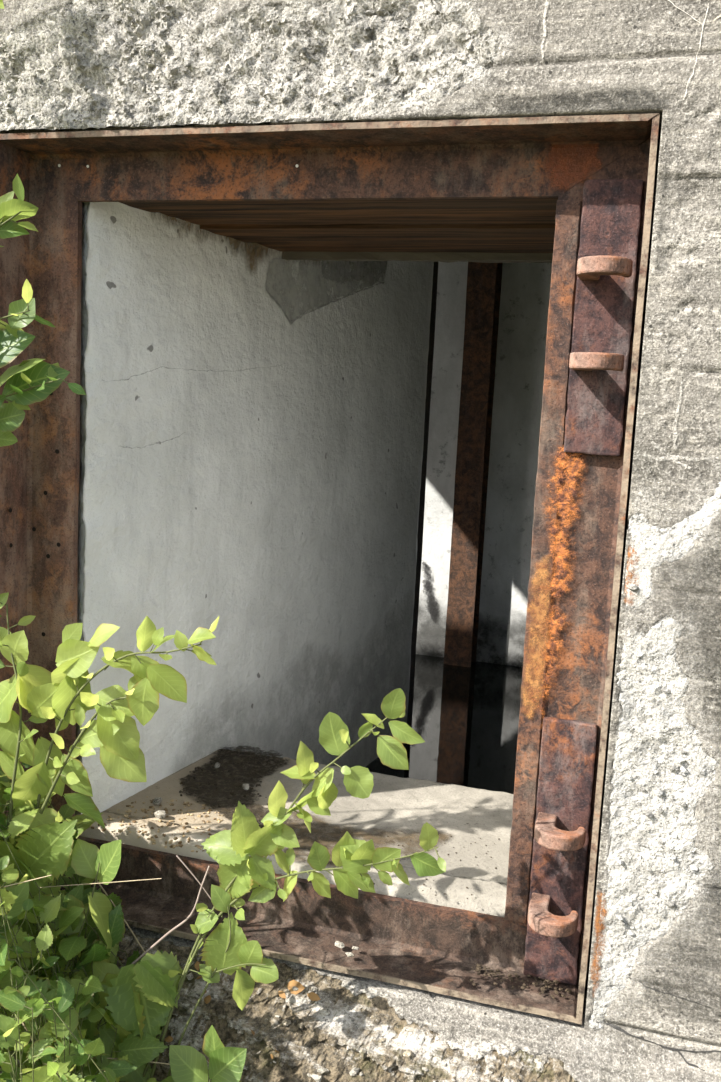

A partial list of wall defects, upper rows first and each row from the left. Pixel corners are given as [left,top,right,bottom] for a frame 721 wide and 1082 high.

spalling [0,0,510,130]
crack [668,0,721,100]
rust [522,447,585,718]
rust [624,546,641,605]
peeling [625,482,721,608]
spalling [588,615,719,1030]
spalling [116,930,577,1082]
rust [591,893,607,991]